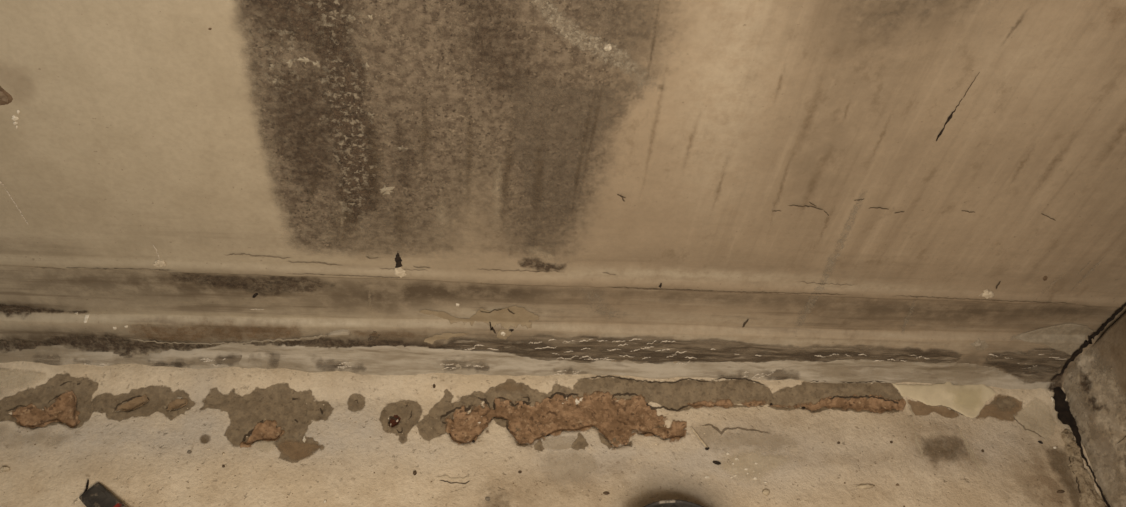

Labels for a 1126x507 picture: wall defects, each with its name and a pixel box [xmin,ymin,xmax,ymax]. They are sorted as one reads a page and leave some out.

damp [239,0,641,271]
crack [936,73,979,141]
damp [0,304,87,316]
damp [0,335,213,356]
damp [252,338,444,349]
crack [1051,303,1126,507]